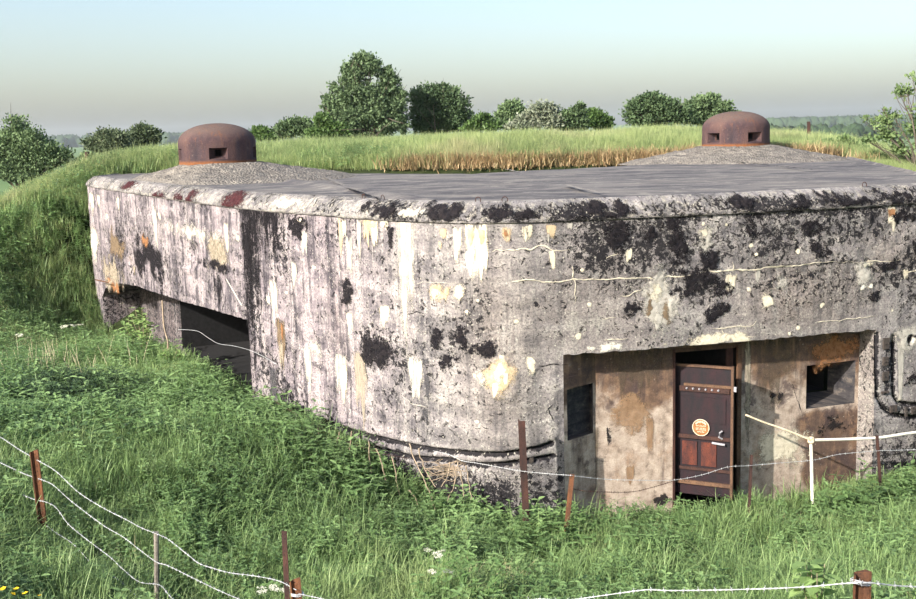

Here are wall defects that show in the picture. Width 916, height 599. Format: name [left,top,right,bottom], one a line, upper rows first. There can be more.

water stain [142,196,316,385]
water stain [335,206,504,427]
peeling [641,264,679,344]
water stain [601,217,737,325]
crack [492,245,916,303]
water stain [303,347,312,392]
peeling [477,357,536,397]